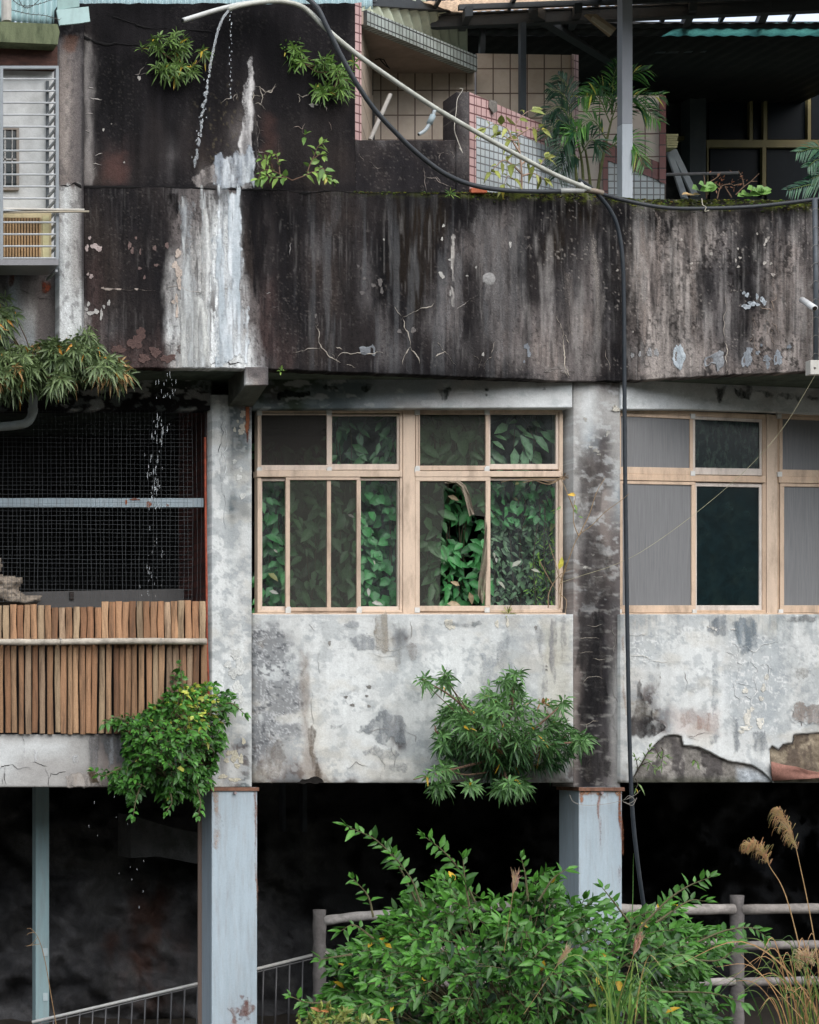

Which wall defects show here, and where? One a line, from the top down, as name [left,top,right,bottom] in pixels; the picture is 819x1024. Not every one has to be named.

damp [168,11,268,367]
peeling [84,273,121,320]
peeling [128,236,182,318]
damp [448,234,462,336]
damp [592,238,605,337]
spalling [111,327,181,363]
crack [299,306,495,365]
peeling [672,344,686,370]
peeling [741,344,792,370]
damp [577,534,612,722]
crack [0,735,66,786]
spalling [633,733,819,782]